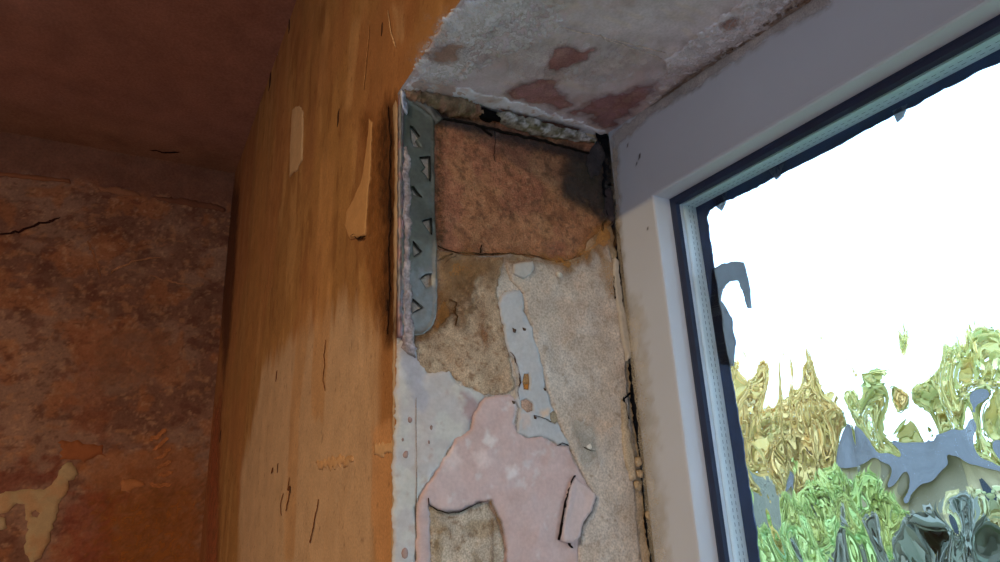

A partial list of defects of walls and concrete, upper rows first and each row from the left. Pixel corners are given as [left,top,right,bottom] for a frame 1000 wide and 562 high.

peeling [289,106,304,178]
peeling [345,118,373,240]
water stain [437,111,614,224]
flaking render [404,45,656,279]
crack [0,217,60,235]
flaking render [621,399,637,481]
flaking render [429,503,504,562]
flaking render [560,477,597,544]